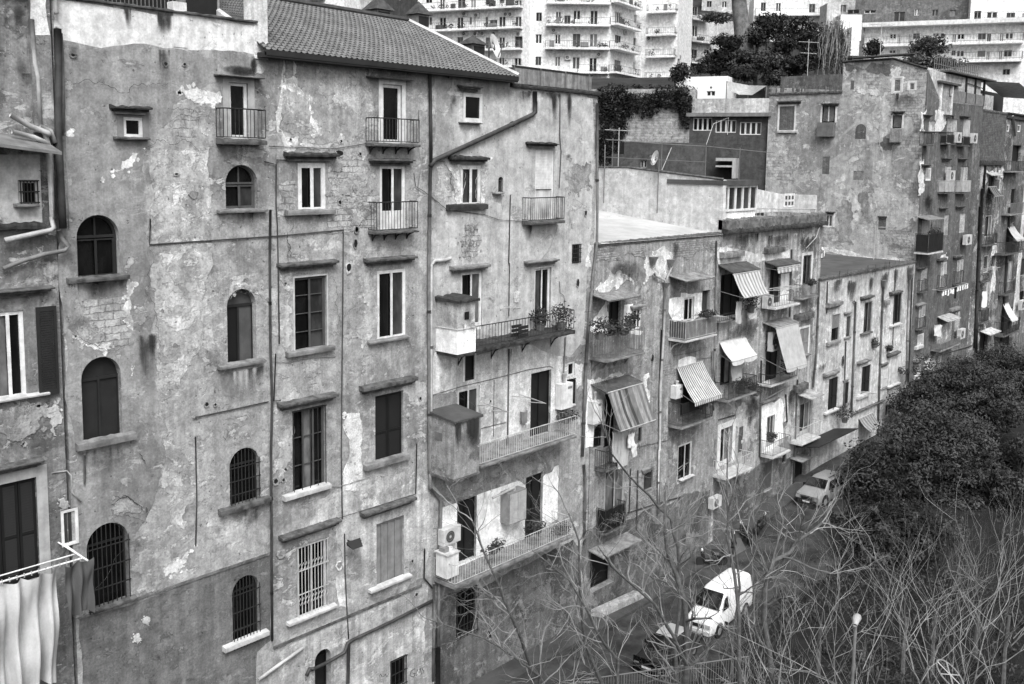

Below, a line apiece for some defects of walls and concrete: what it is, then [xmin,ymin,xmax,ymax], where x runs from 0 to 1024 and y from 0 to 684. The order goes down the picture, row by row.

flaking render [177,82,222,109]
flaking render [255,60,322,152]
spalling [823,62,946,261]
flaking render [60,127,214,401]
flaking render [576,237,718,293]
water stain [140,334,156,369]
spalling [0,398,63,448]
flaking render [342,412,365,492]